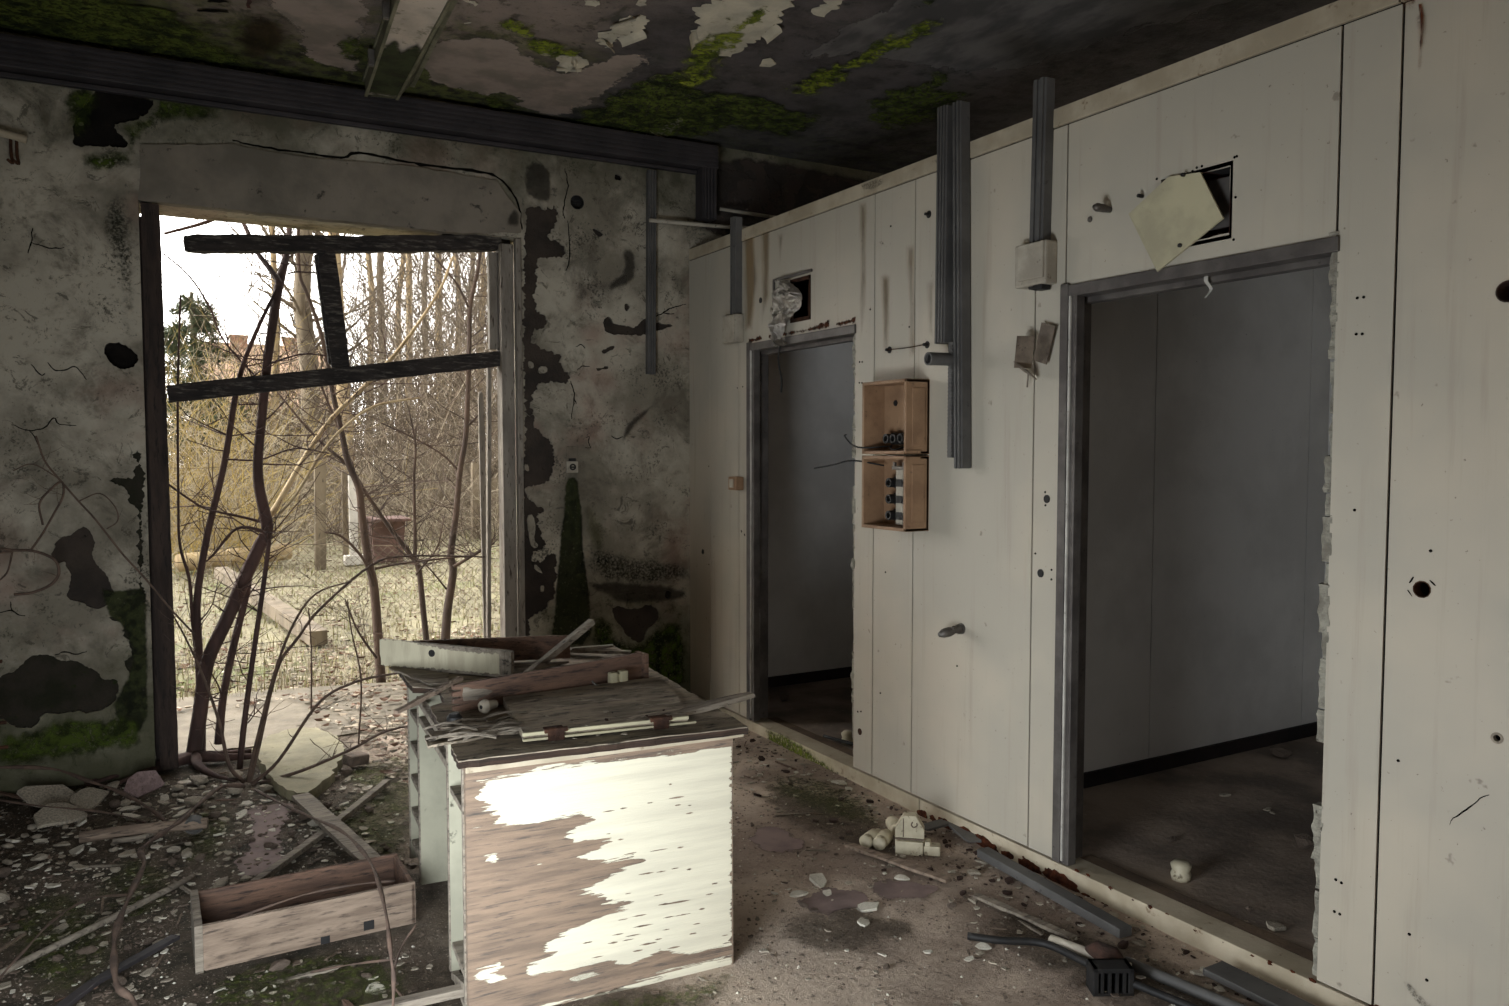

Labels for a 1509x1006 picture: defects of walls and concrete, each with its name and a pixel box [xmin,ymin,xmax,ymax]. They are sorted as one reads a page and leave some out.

peeling [271,0,370,72]
peeling [424,0,650,115]
peeling [689,0,842,67]
spalling [73,91,153,148]
crack [232,139,523,230]
crack [562,171,570,271]
spalling [596,303,672,371]
peeling [522,206,570,636]
spalling [110,451,146,595]
spalling [0,527,147,728]
rust [917,810,1113,906]